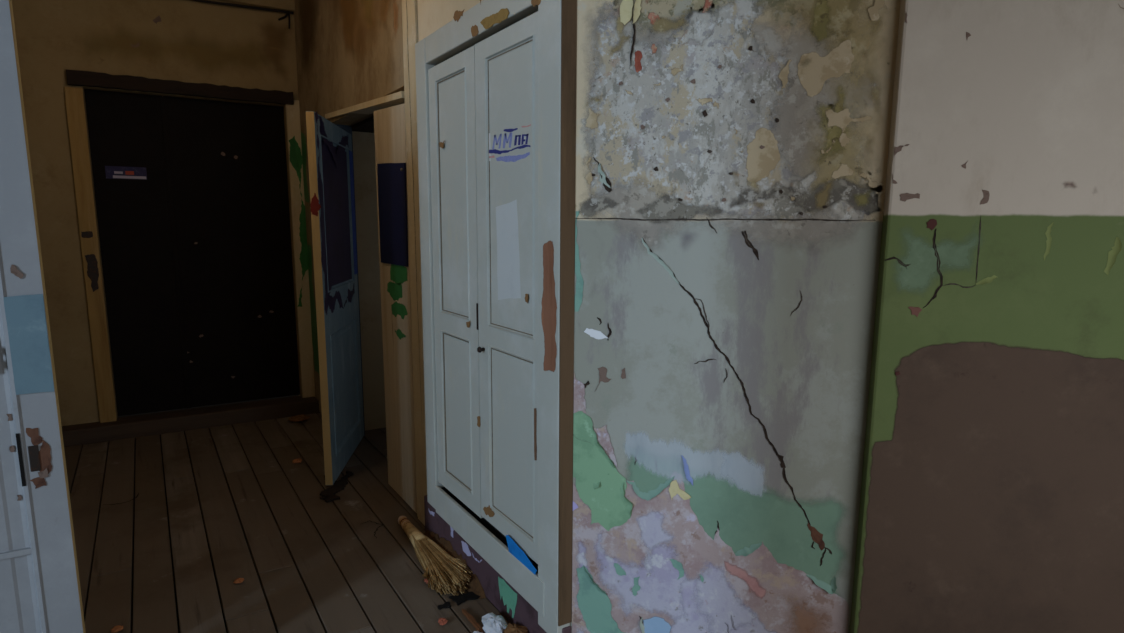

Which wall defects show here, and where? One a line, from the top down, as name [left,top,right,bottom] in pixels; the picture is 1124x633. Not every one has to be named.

peeling [584,0,878,247]
spalling [892,144,920,202]
crack [885,219,997,308]
crack [575,217,875,566]
peeling [572,342,1124,633]